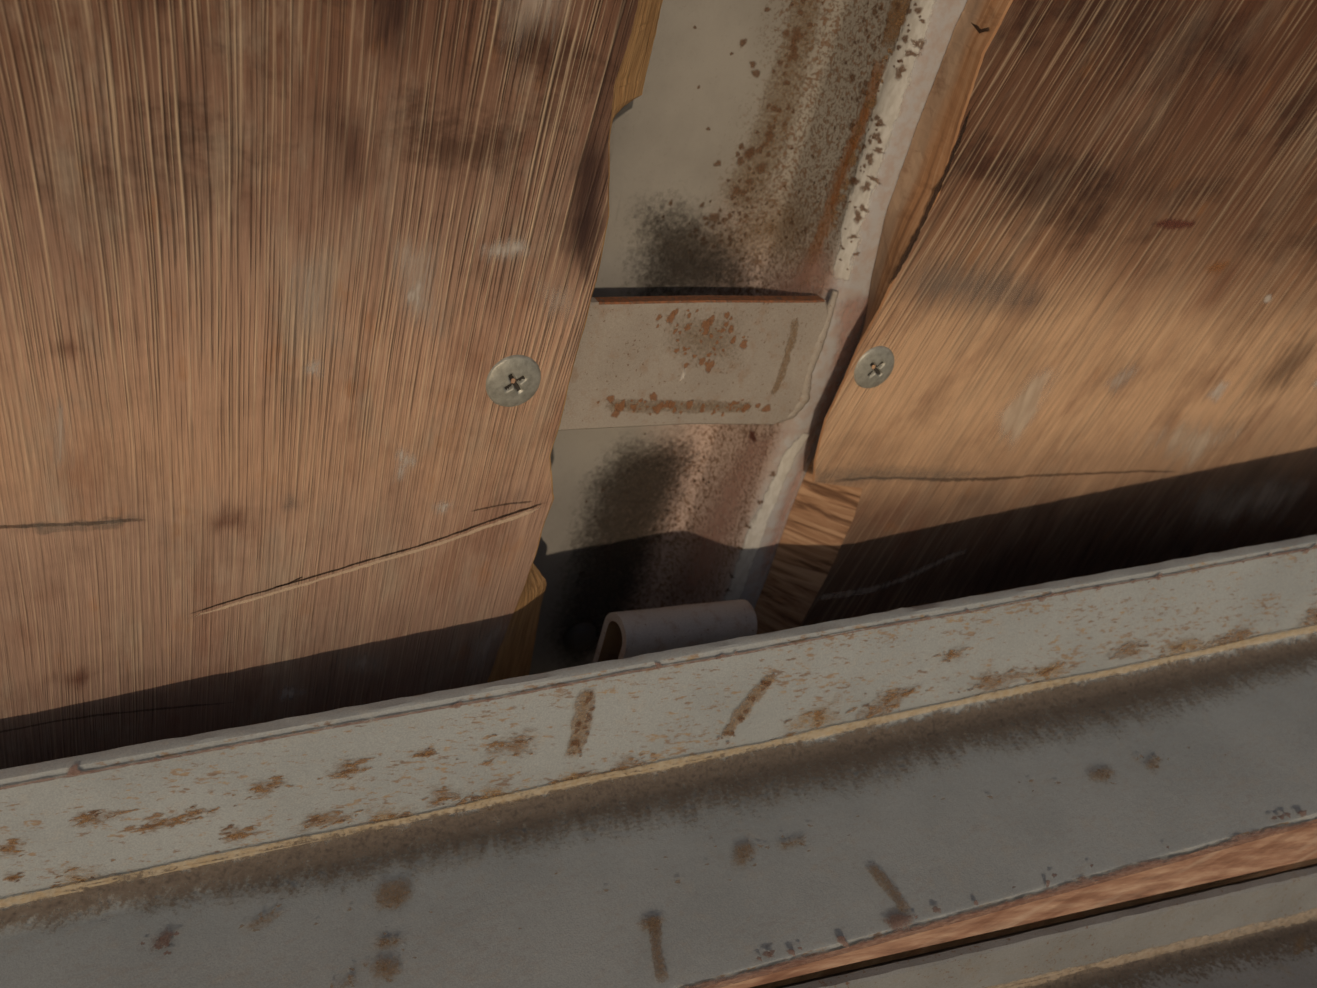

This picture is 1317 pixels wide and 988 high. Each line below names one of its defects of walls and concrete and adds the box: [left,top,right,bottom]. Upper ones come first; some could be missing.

rust [842,0,910,106]
rust [689,0,824,260]
rust [597,321,798,418]
rust [594,295,825,372]
crack [194,504,539,615]
rust [0,545,1317,907]
rust [642,917,668,980]
rust [685,810,1317,988]